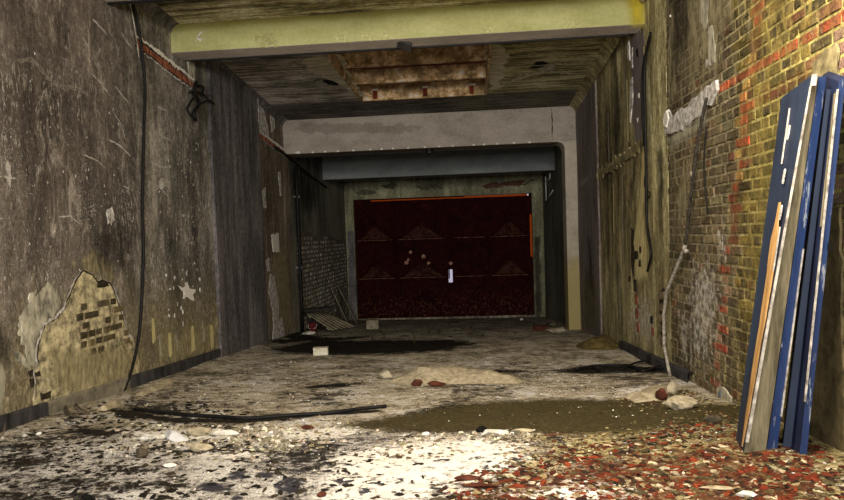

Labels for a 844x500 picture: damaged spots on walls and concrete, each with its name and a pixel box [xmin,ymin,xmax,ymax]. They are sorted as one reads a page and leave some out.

peeling [706,25,716,68]
peeling [100,206,115,225]
spalling [14,250,140,405]
water stain [682,270,717,359]